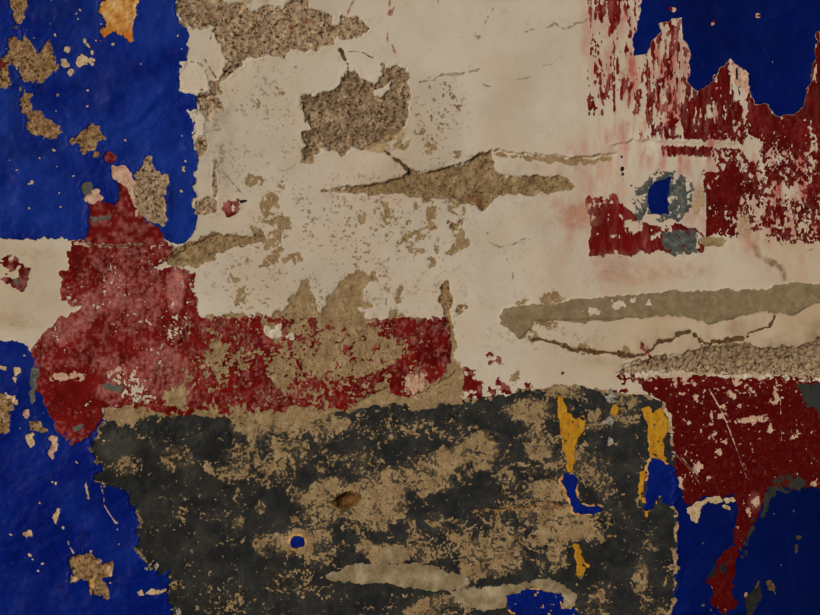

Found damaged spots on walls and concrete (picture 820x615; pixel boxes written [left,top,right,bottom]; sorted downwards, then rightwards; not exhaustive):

peeling [0,0,139,152]
flaking render [175,0,370,157]
flaking render [300,63,437,164]
peeling [321,0,820,269]
peeling [0,123,820,615]